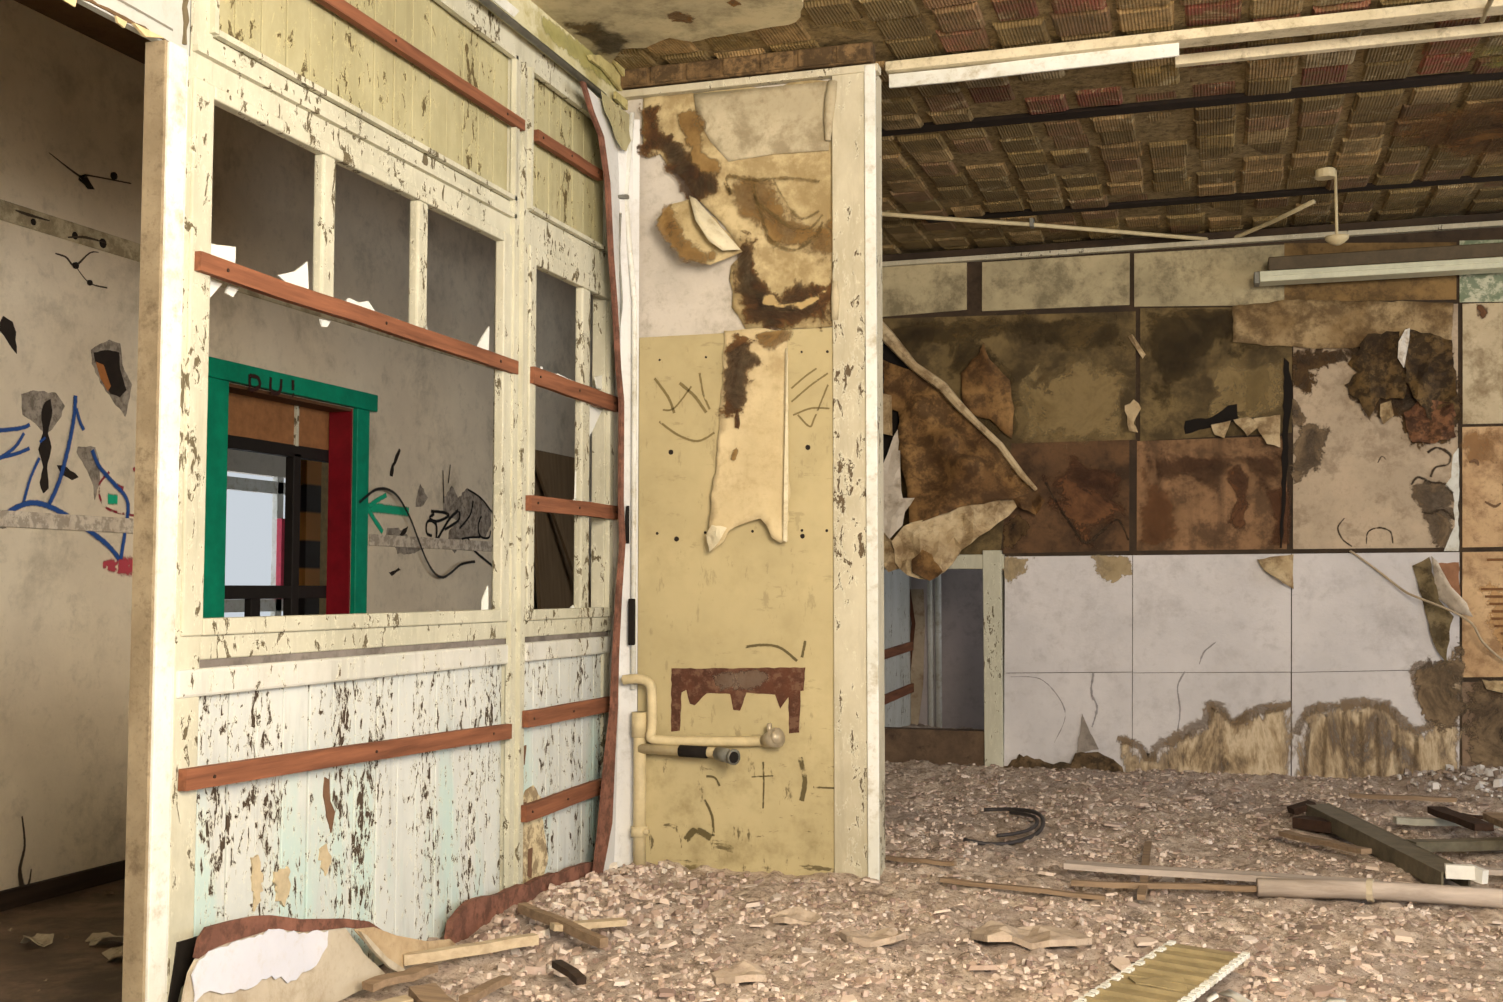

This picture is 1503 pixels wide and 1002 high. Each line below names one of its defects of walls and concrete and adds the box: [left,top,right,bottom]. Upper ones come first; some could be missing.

flaking render [614,0,1503,255]
flaking render [91,340,132,416]
peeling [318,777,335,876]
peeling [250,855,291,912]